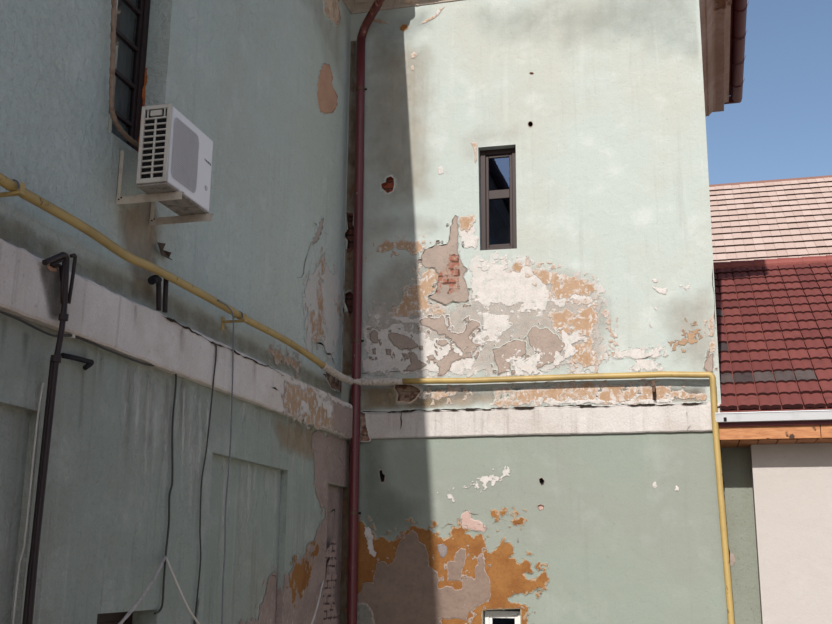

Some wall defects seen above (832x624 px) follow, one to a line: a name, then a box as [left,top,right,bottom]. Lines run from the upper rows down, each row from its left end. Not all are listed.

spalling [316,62,338,115]
spalling [380,175,395,194]
peeling [308,217,338,354]
peeling [363,214,707,408]
spalling [669,313,717,373]
spalling [239,341,371,624]
spalling [357,503,550,624]